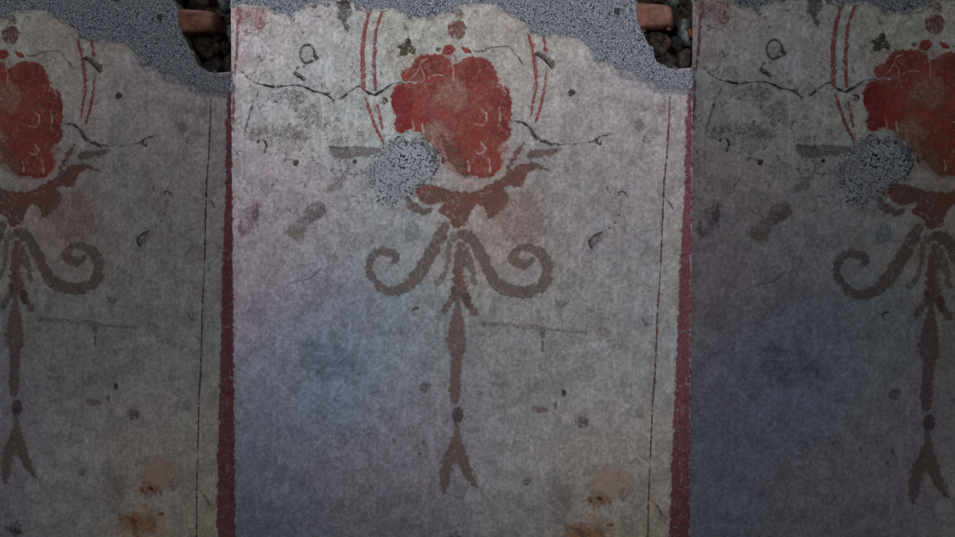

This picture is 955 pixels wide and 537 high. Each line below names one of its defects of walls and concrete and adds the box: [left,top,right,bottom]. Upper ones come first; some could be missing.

flaking render [693,0,796,16]
flaking render [806,0,940,27]
flaking render [0,0,234,97]
flaking render [229,0,695,94]
crack [242,72,417,128]
crack [704,68,891,132]
crack [516,121,609,145]
flaking render [367,136,443,207]
flaking render [836,133,918,206]